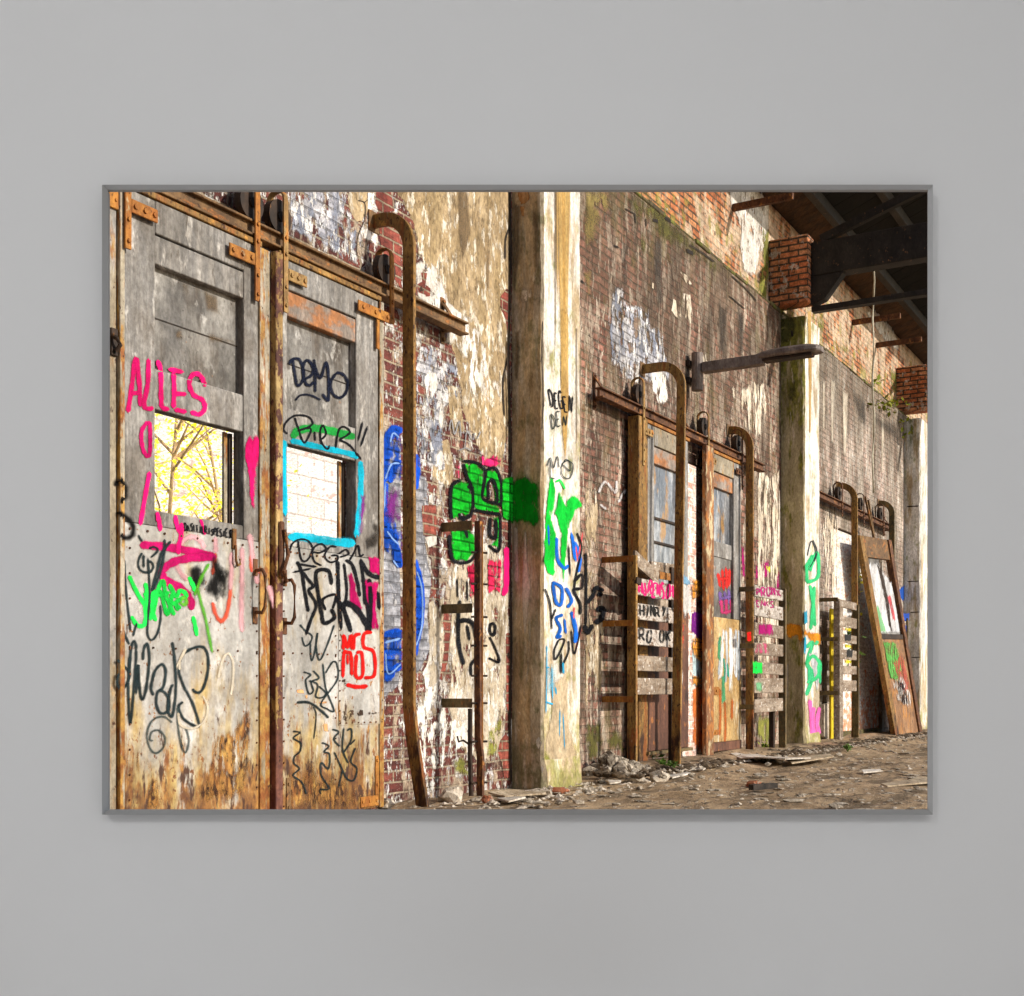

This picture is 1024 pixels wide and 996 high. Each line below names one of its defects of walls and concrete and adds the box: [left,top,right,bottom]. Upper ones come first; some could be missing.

rust [207,295,217,310]
spalling [672,273,693,323]
peeling [608,288,669,403]
peeling [290,192,535,779]
rust [201,711,250,800]
rust [148,780,159,807]
rust [283,768,371,809]